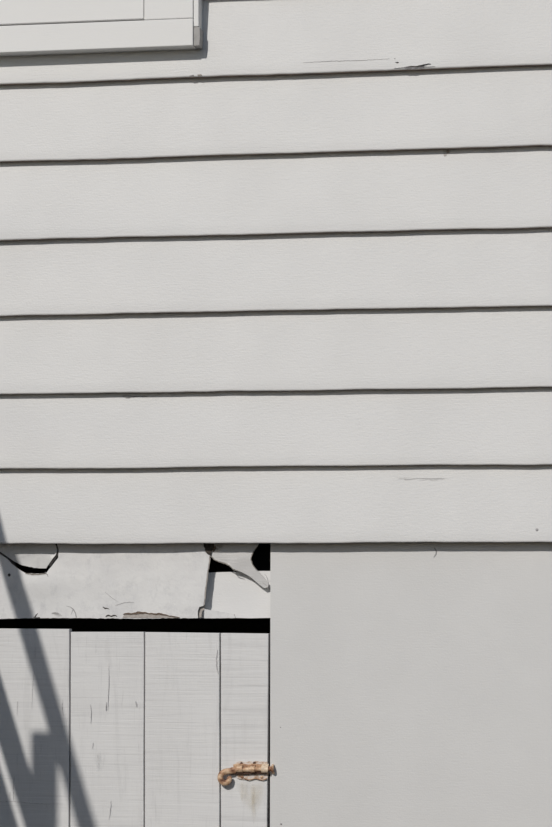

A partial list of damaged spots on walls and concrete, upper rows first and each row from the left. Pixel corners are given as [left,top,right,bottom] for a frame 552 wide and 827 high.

spalling [0,544,59,576]
spalling [250,543,270,571]
spalling [198,546,240,617]